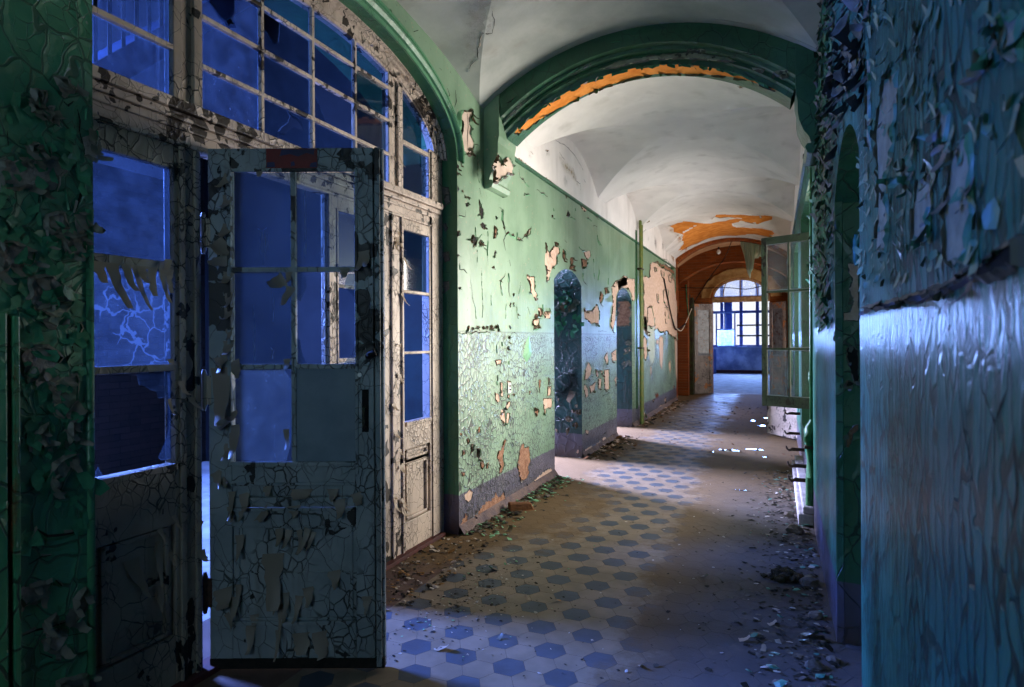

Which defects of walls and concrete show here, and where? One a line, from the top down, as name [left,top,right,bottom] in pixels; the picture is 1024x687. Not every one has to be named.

peeling [442,108,503,283]
peeling [492,154,529,184]
peeling [805,0,1024,391]
peeling [0,75,114,556]
peeling [467,324,512,366]
peeling [527,242,667,454]
flaking render [460,488,513,532]
flaking render [460,427,553,486]